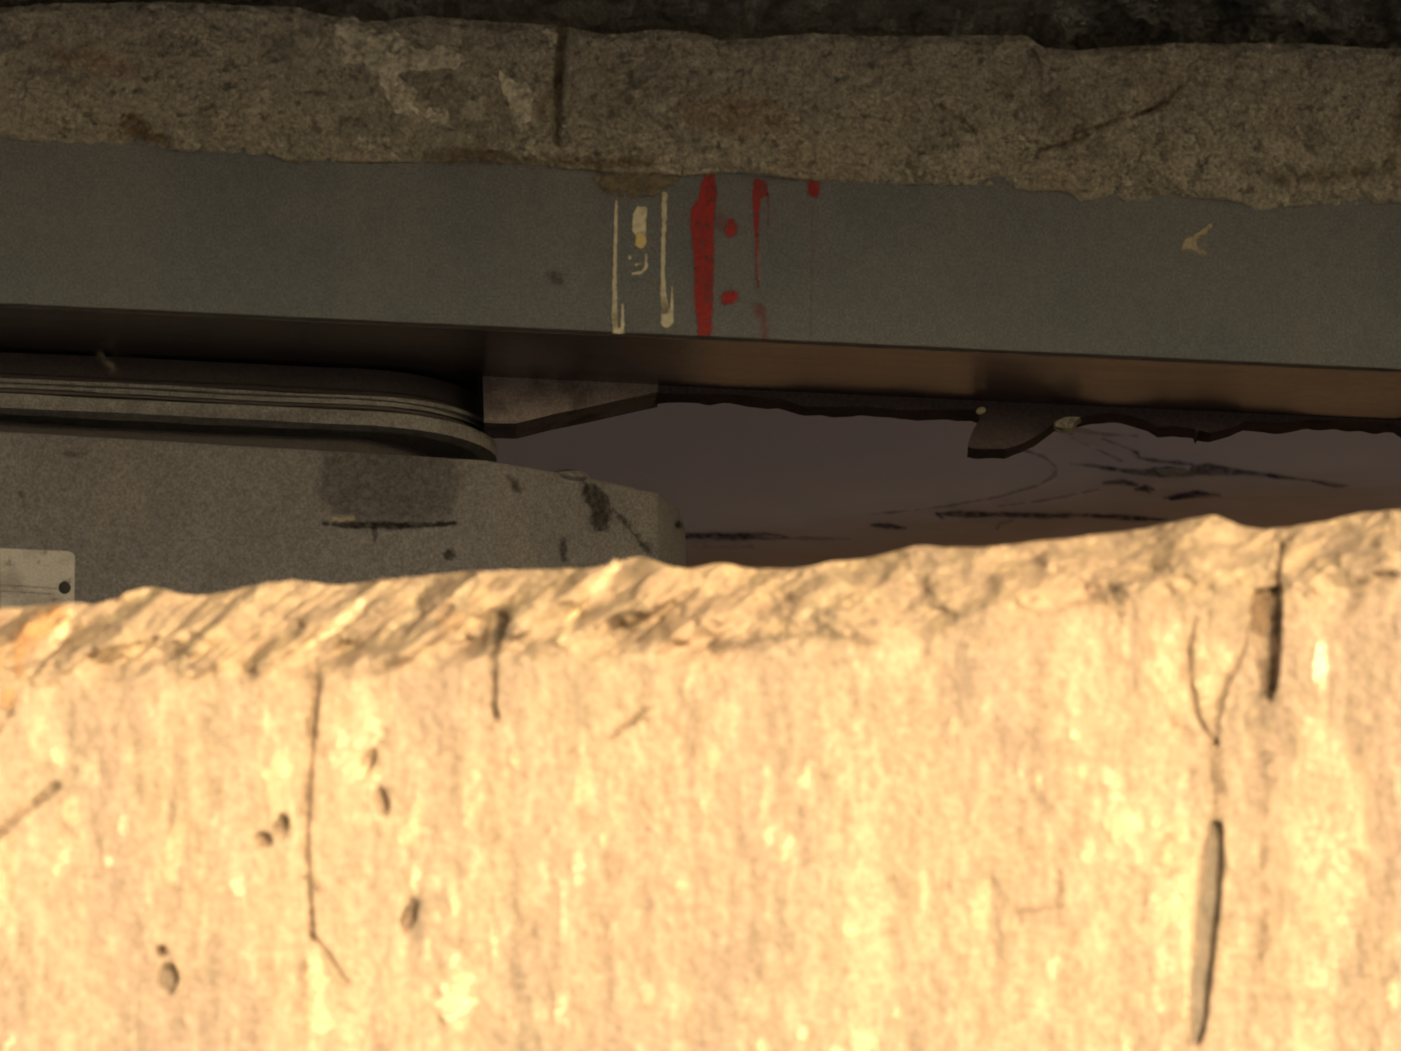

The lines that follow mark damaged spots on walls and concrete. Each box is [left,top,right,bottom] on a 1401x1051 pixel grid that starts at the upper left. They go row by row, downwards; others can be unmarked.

crack [1047,86,1182,148]
rust [0,606,68,732]
crack [307,673,318,737]
crack [1213,662,1238,823]
crack [303,775,311,814]